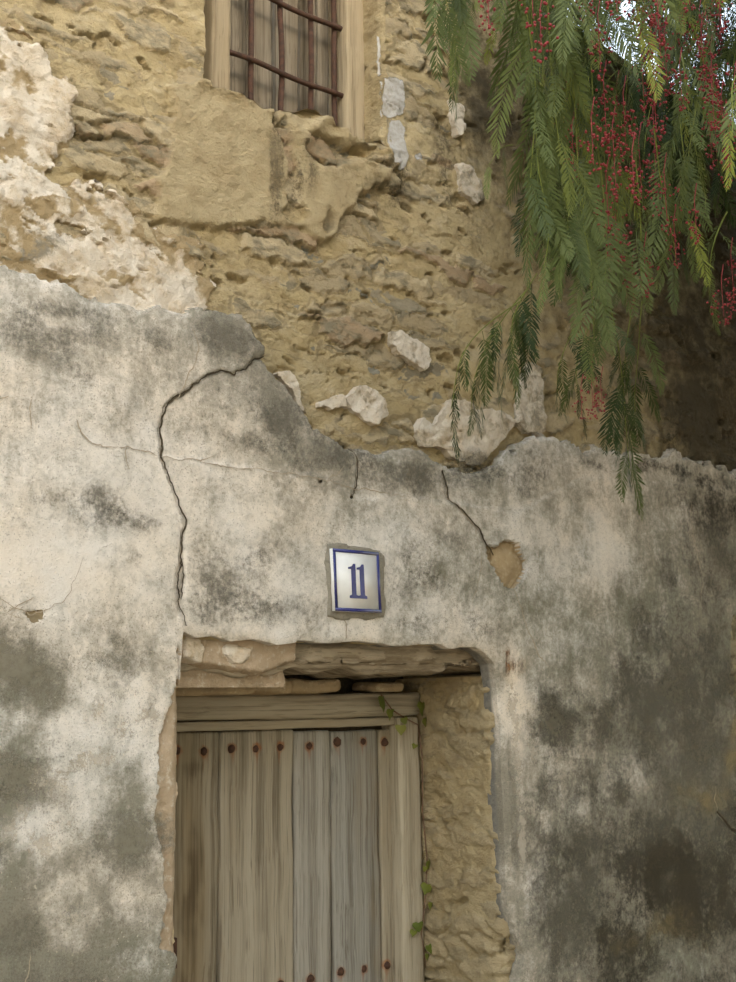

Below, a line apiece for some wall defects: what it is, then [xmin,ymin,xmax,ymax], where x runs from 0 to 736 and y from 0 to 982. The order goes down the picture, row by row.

peeling [0,0,736,473]
leakage [87,488,145,528]
crack [76,327,403,626]
crack [441,470,493,555]
leakage [642,460,736,586]
crack [0,557,84,620]
spalling [486,540,525,588]
leakage [0,631,60,700]
leakage [98,632,143,673]
leakage [508,608,736,982]
crack [714,787,736,832]
leakage [94,812,172,877]